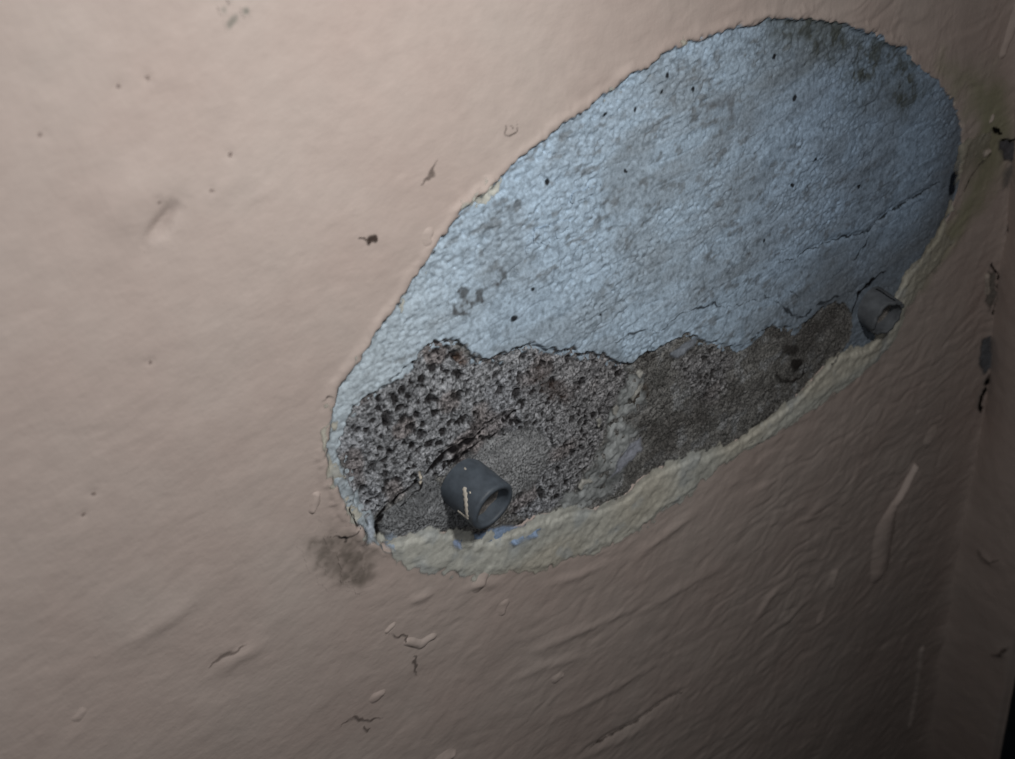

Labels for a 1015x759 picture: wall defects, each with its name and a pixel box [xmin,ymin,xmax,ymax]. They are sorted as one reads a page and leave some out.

crack [780,182,937,263]
flaking render [321,24,1015,581]
crack [616,270,886,343]
leakage [297,510,391,594]